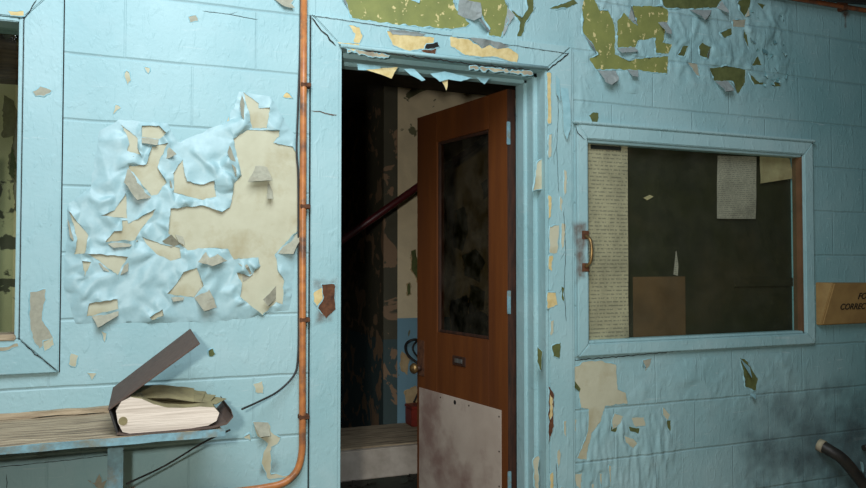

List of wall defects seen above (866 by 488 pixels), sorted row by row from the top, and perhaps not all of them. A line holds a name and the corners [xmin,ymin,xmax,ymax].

peeling [337,0,536,90]
peeling [549,0,790,93]
peeling [532,72,571,271]
peeling [449,206,488,336]
peeling [243,421,289,480]
peeling [532,448,564,488]
peeling [575,359,646,460]
spalling [740,358,758,399]